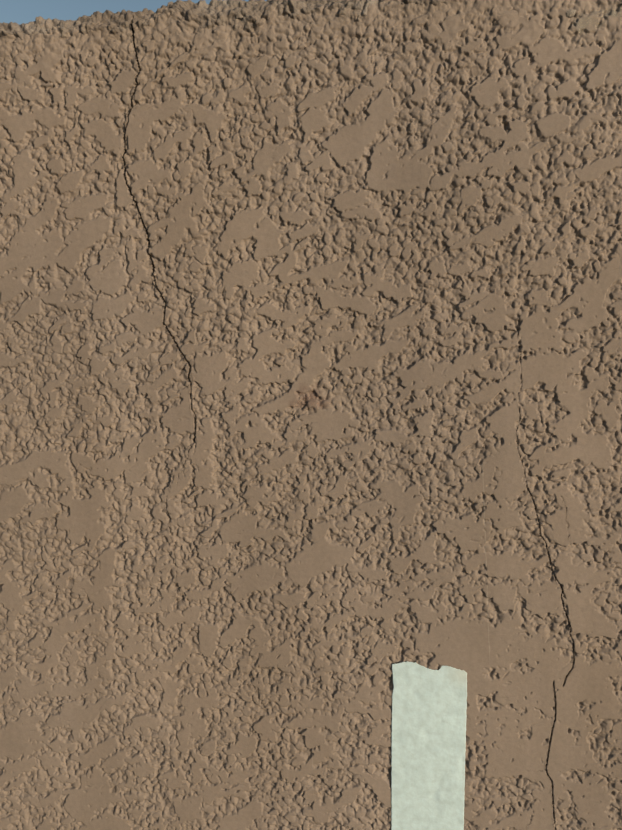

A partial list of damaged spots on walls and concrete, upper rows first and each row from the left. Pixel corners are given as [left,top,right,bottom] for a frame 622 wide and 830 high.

crack [121,22,197,591]
crack [520,456,576,830]